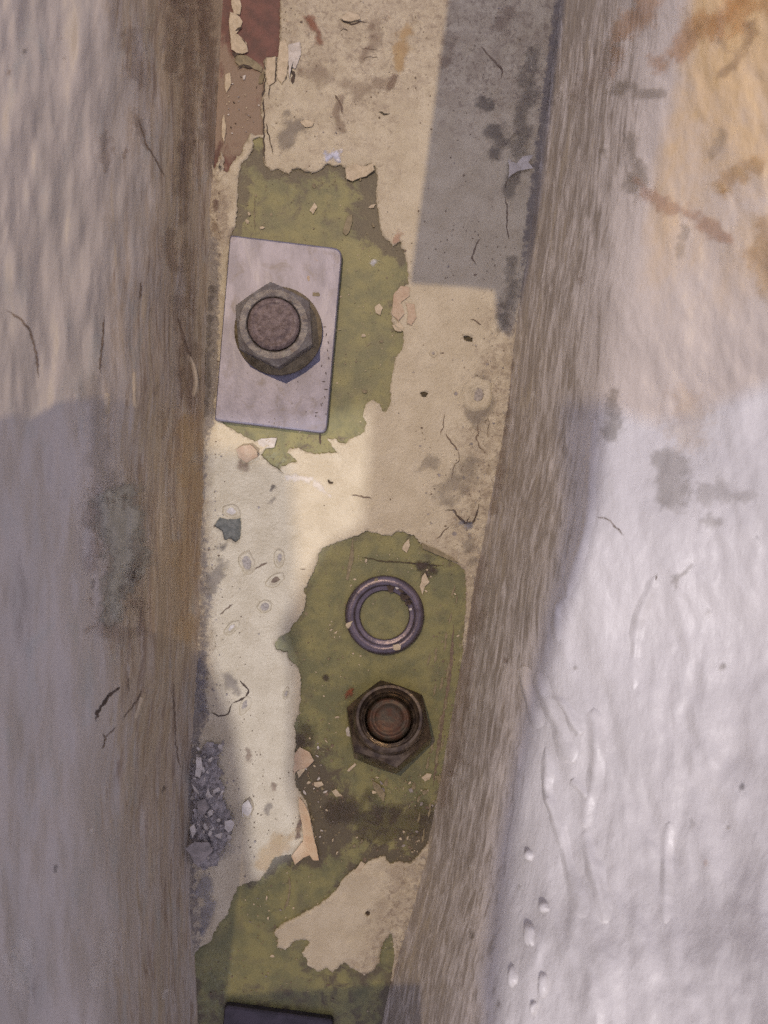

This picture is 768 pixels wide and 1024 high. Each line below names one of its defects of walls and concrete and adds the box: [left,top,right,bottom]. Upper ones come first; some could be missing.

peeling [214,0,416,471]
crack [440,414,490,479]
spalling [214,518,241,542]
crack [438,505,479,538]
crack [95,678,142,749]
crack [212,681,249,717]
spalling [185,742,235,871]
peeling [195,531,466,1024]